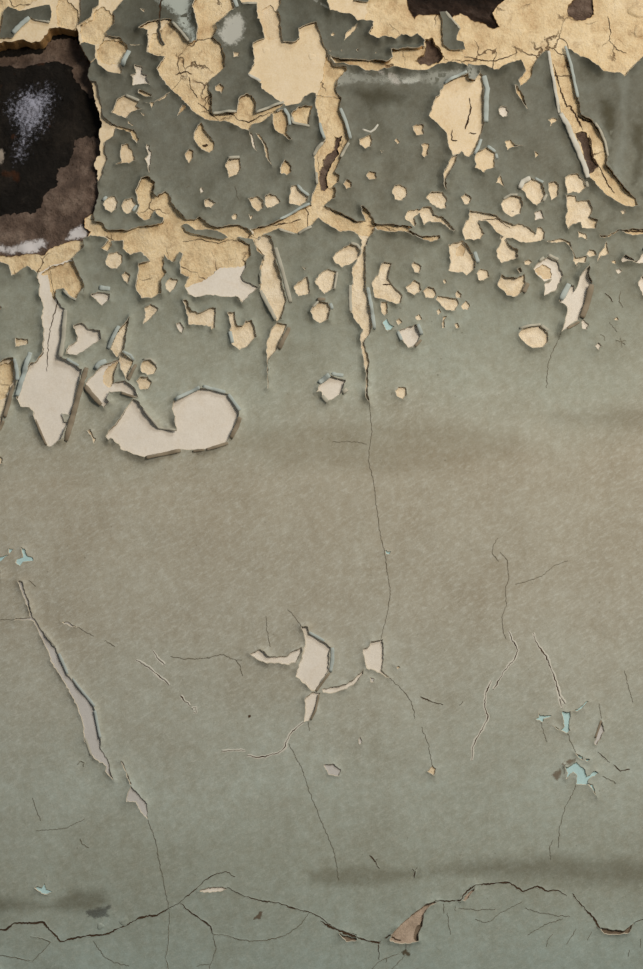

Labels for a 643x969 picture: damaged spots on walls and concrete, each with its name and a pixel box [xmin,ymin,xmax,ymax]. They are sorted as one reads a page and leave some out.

leakage [10,88,55,157]
leakage [0,239,45,254]
leakage [65,226,87,240]
flaking render [0,0,643,459]
peeling [250,626,400,722]
spalling [536,701,589,733]
crack [0,821,406,969]
crack [435,880,601,947]